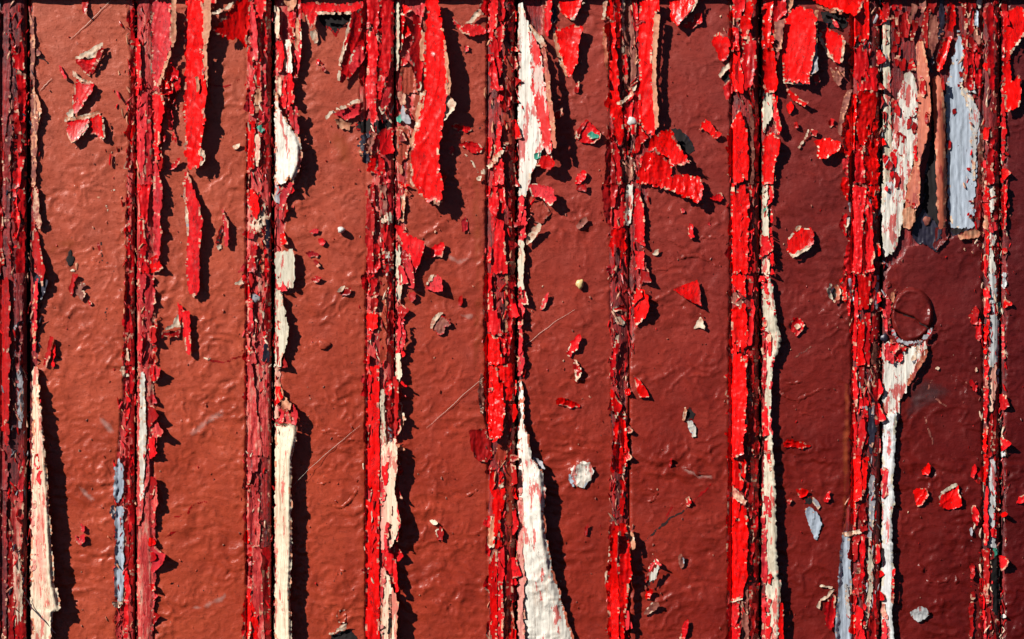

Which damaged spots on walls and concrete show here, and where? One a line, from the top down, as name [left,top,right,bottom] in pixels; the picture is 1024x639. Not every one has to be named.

peeling [59,43,105,144]
peeling [544,0,584,93]
peeling [0,9,56,639]
peeling [109,0,556,639]
peeling [555,397,580,408]
peeling [566,334,582,382]
peeling [575,0,1024,639]